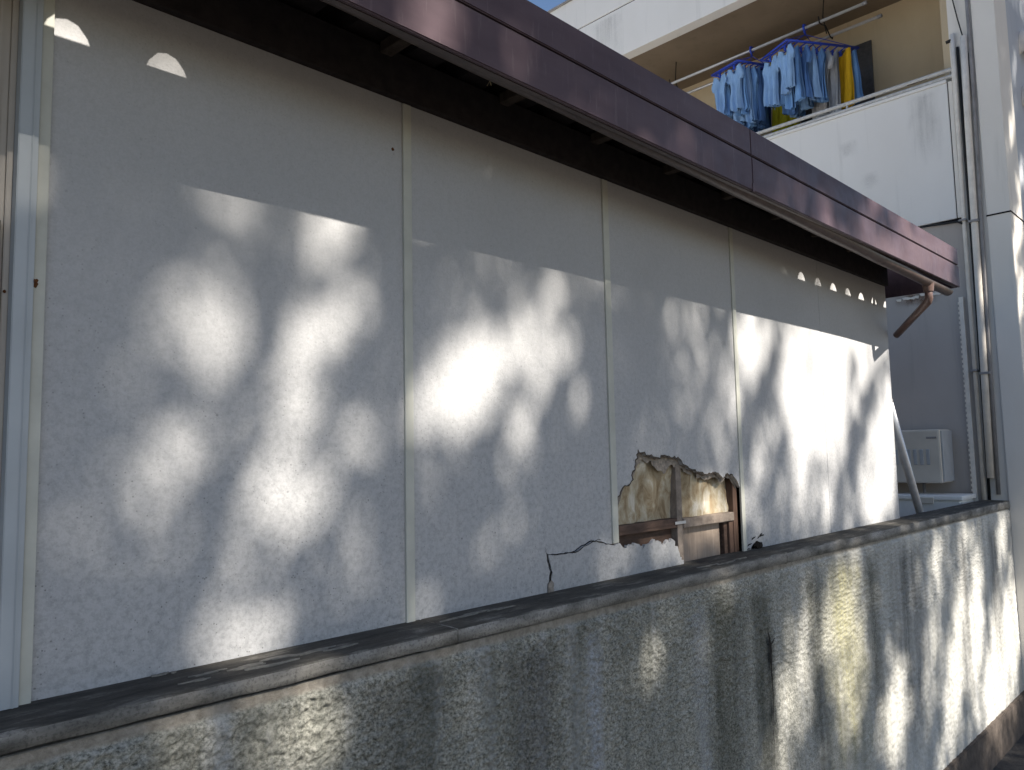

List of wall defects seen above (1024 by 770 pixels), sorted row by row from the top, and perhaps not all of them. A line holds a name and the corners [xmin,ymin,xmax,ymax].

crack [546,539,612,593]
spalling [612,450,764,568]